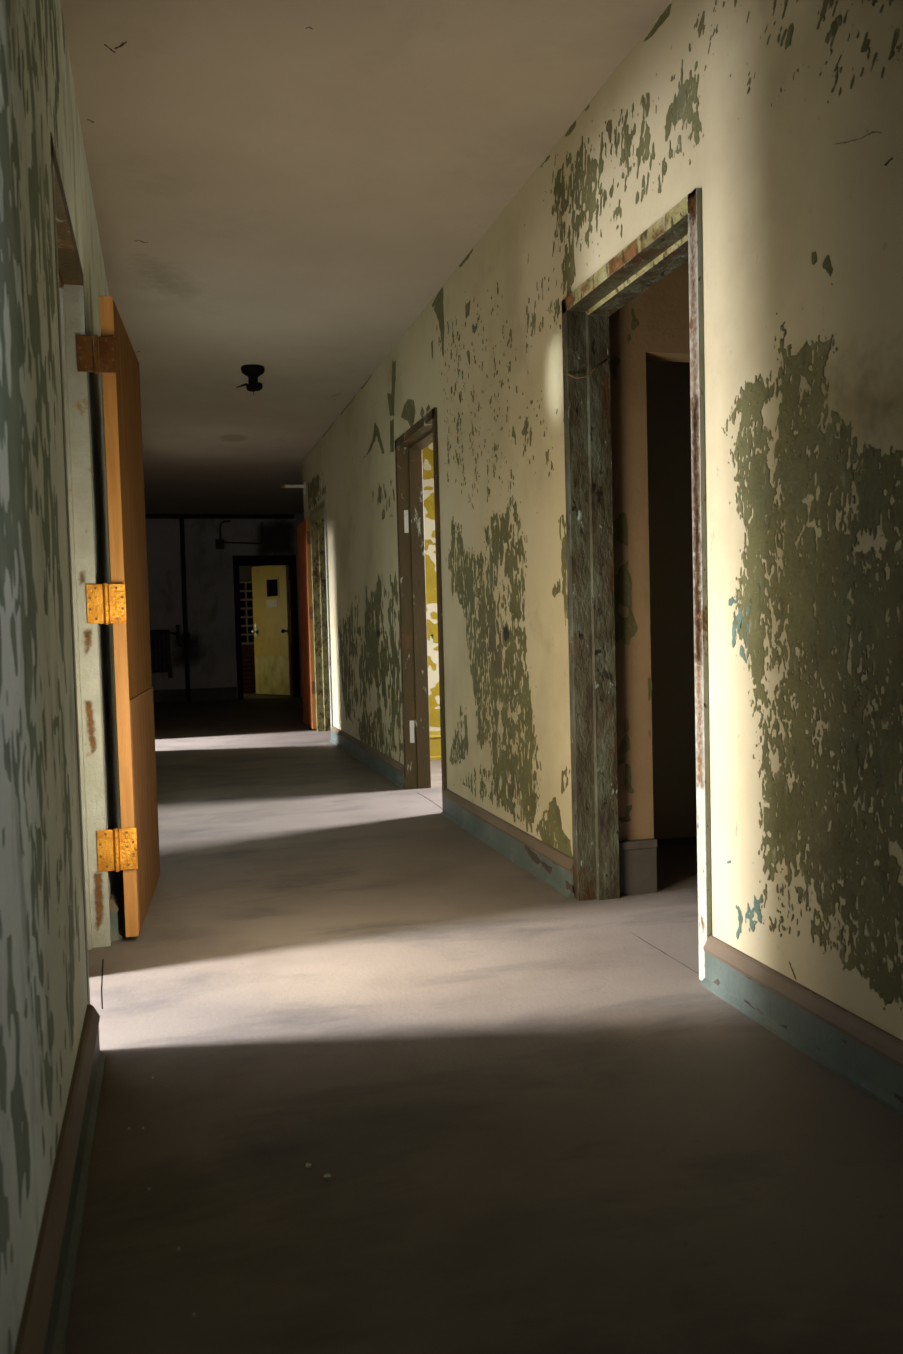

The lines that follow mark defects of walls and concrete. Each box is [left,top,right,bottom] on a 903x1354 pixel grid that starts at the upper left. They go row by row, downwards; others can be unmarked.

peeling [760,0,798,49]
peeling [771,0,903,107]
peeling [811,252,833,285]
peeling [364,361,430,458]
peeling [422,0,749,894]
peeling [338,571,403,763]
peeling [721,313,903,1011]